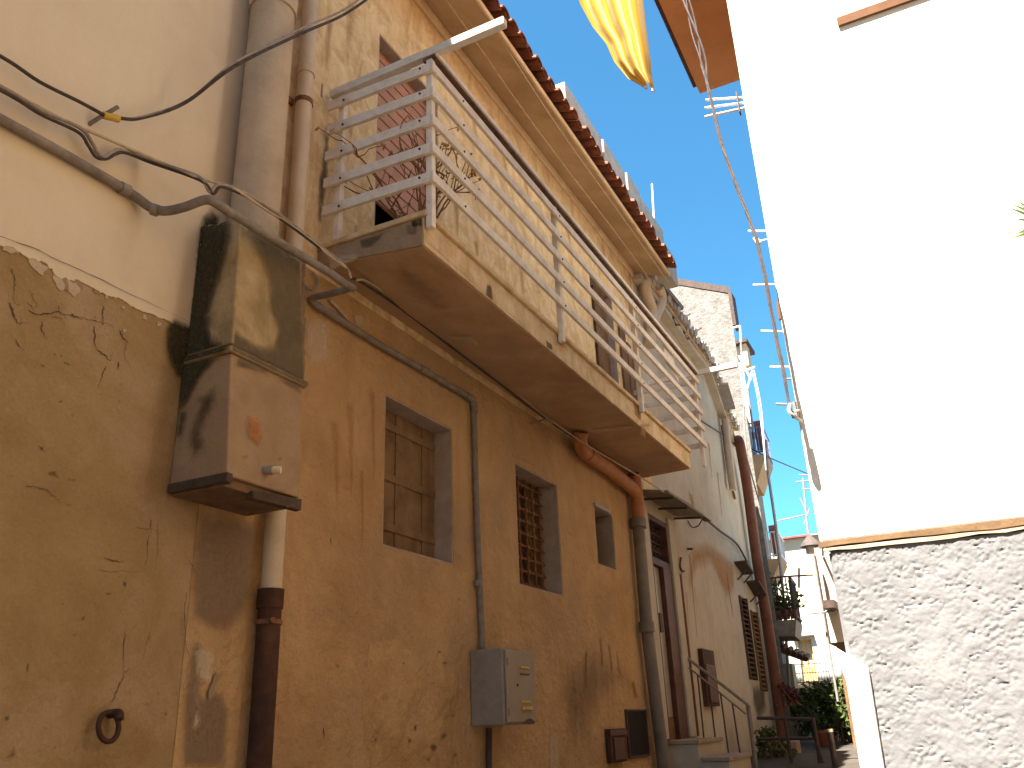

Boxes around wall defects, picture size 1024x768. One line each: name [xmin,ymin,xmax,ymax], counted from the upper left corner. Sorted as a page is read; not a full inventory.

crack [9,270,131,388]
peeling [0,236,185,327]
damp [168,214,308,435]
crack [102,520,158,572]
crack [112,634,150,701]